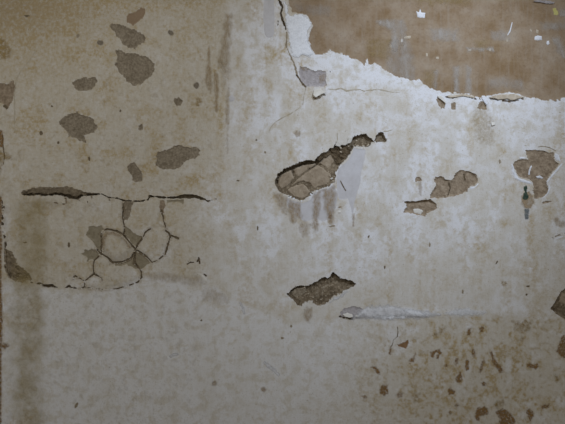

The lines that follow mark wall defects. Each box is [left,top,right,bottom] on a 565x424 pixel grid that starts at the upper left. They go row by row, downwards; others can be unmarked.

spalling [110,7,155,86]
crack [269,0,307,131]
crack [330,86,400,94]
peeling [283,0,565,110]
spalling [156,145,200,170]
spalling [275,130,391,222]
spalling [404,170,478,216]
spalling [511,139,562,204]
crack [1,201,11,278]
crack [21,186,210,290]
spalling [287,272,356,306]
rust [495,403,515,424]